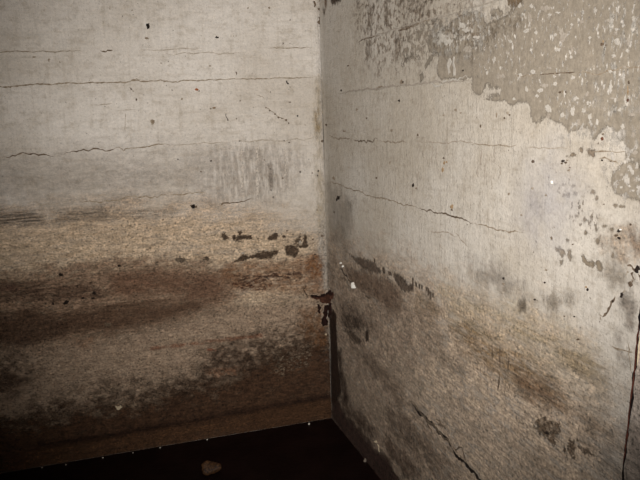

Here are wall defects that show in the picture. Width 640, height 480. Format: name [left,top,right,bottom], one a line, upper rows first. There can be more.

crack [0,76,319,158]
peeling [403,0,640,208]
peeling [221,231,259,241]
peeling [234,235,308,262]
peeling [349,254,434,299]
crack [332,182,518,247]
peeling [557,179,613,244]
damp [0,202,606,480]
crack [612,310,640,480]
crack [411,399,481,480]